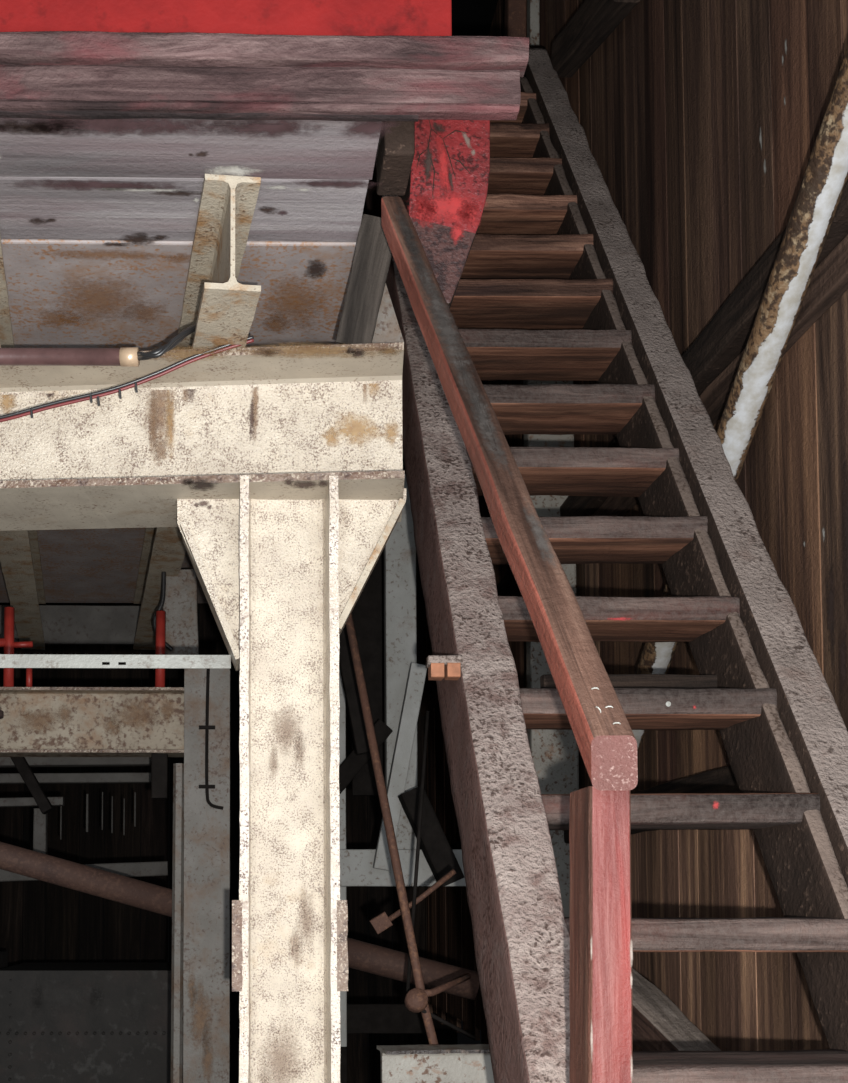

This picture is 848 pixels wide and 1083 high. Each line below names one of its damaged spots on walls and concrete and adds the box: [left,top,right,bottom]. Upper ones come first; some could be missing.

damp [0,121,70,134]
damp [207,120,299,136]
damp [347,121,394,135]
damp [22,180,201,196]
damp [302,180,365,188]
damp [105,233,166,246]
rust [150,390,174,459]
rust [323,417,396,443]